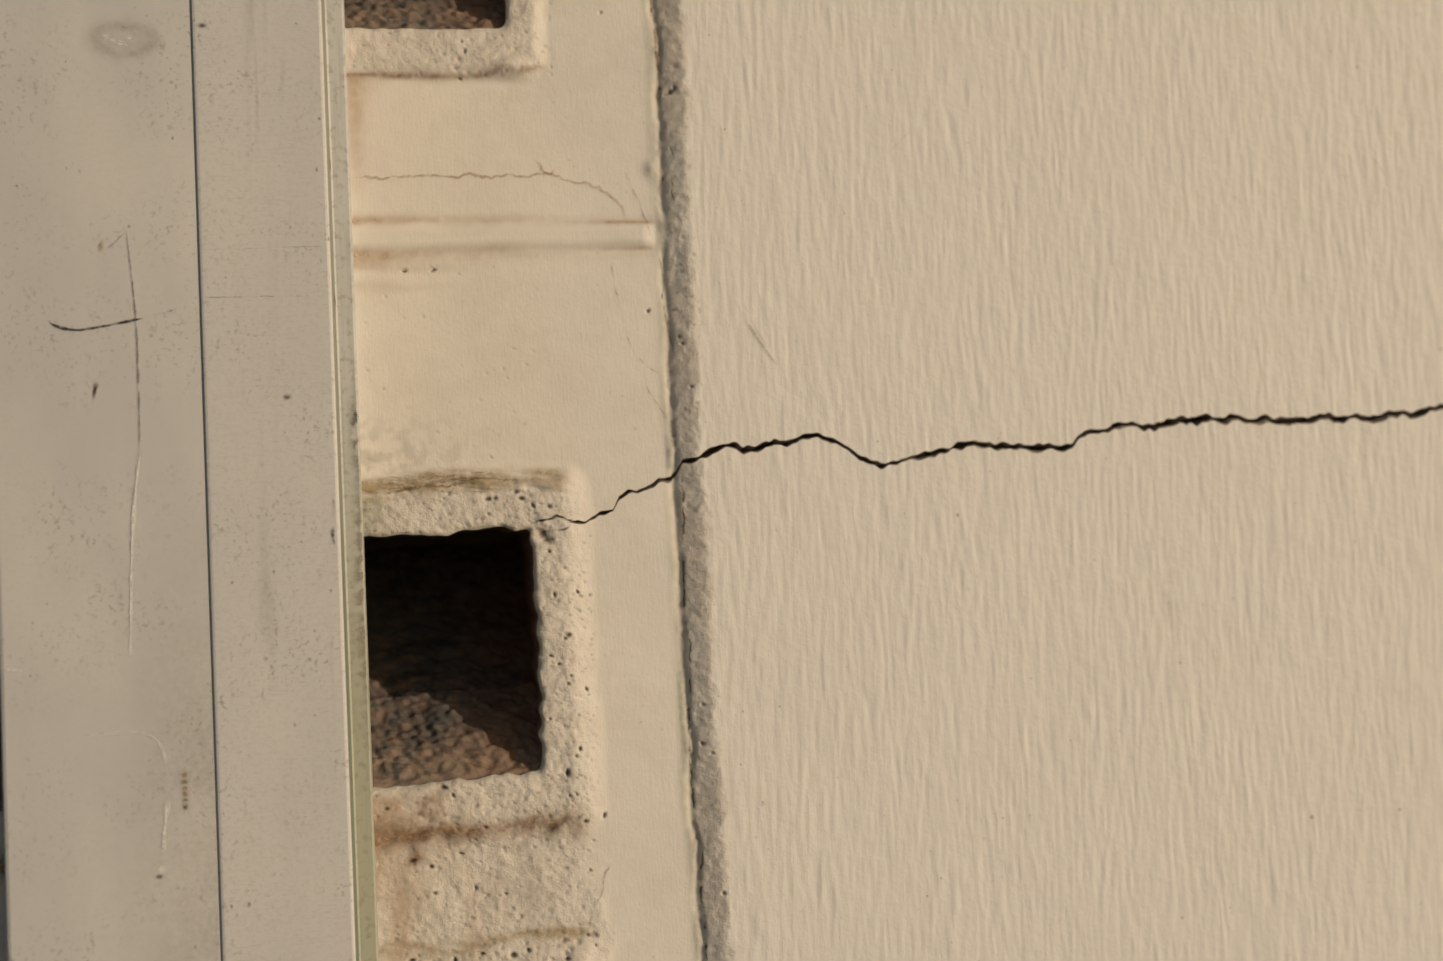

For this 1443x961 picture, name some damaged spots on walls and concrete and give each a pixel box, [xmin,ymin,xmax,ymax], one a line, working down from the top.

crack [539,404,1443,808]
crack [700,852,708,960]